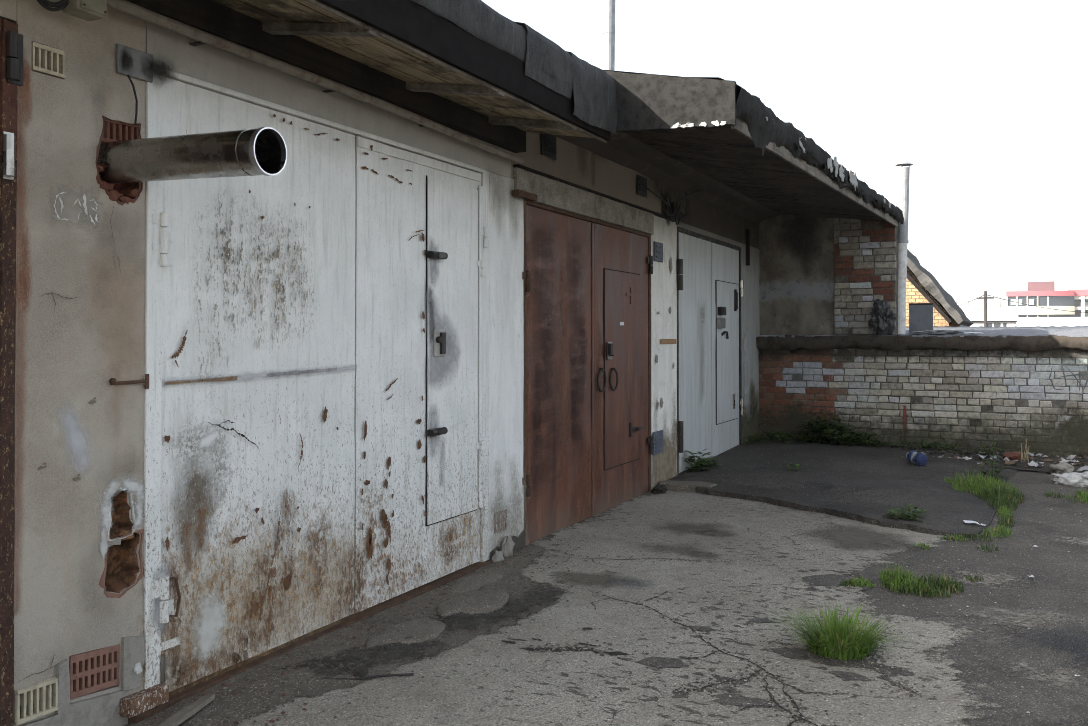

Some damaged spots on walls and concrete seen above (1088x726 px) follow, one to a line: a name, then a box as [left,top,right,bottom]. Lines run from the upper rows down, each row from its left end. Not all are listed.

corrosion [17,66,30,302]
spalling [54,116,143,225]
damp [430,242,458,381]
spalling [99,479,144,598]
damp [178,432,232,566]
crack [208,420,258,447]
corrosion [161,490,427,691]
corrosion [438,512,478,564]
crack [544,584,918,726]